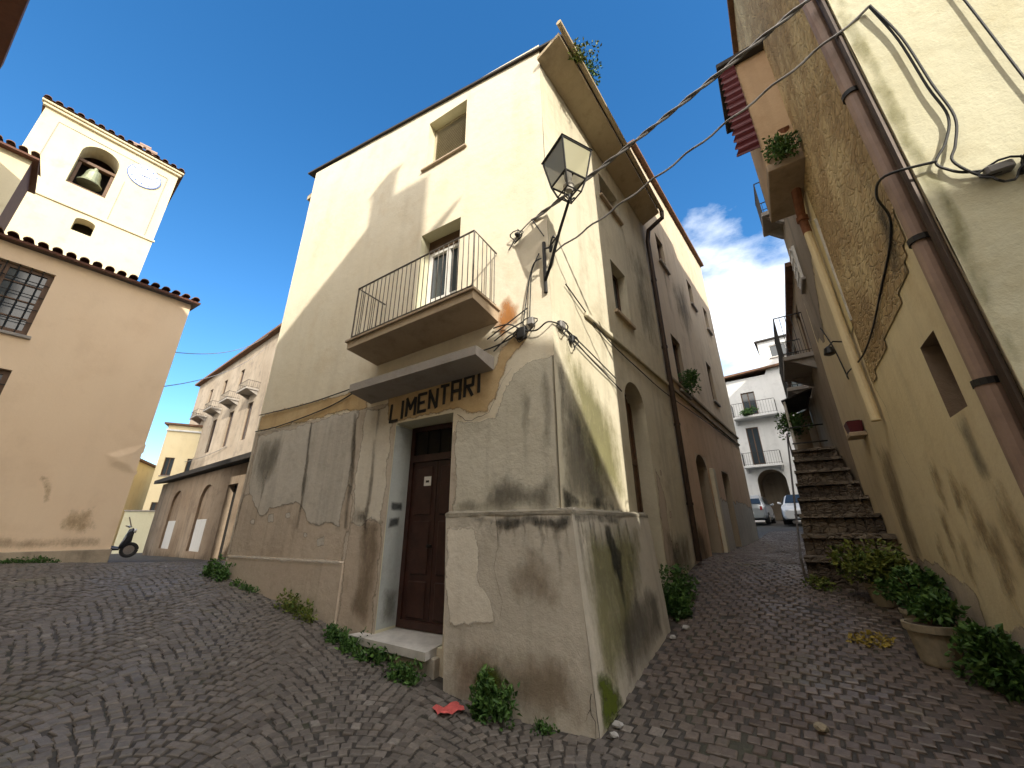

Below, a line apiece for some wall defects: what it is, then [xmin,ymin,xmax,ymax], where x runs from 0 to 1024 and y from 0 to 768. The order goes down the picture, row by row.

rust [499,301,516,332]
peeling [249,392,367,546]
water stain [497,493,580,529]
peeling [445,528,494,627]
water stain [594,499,660,670]